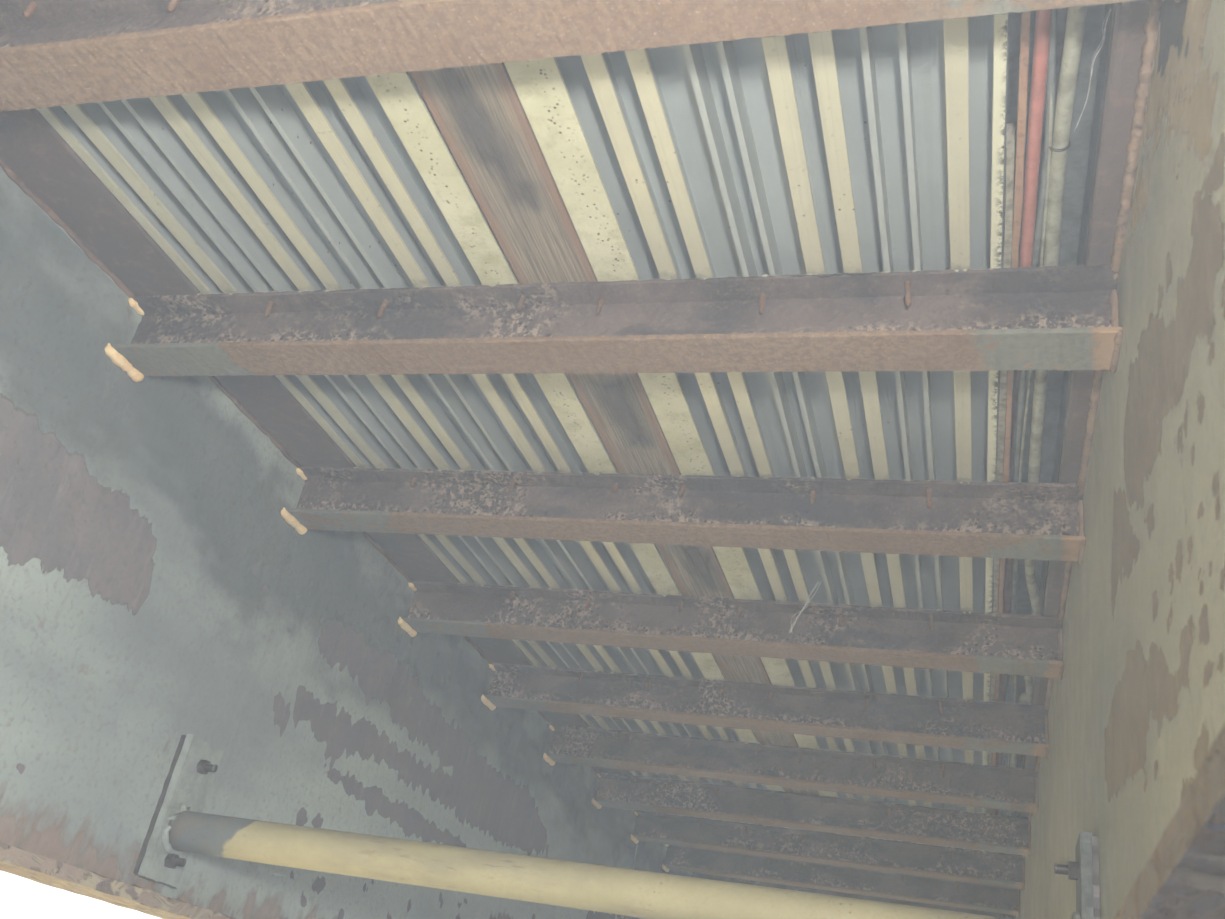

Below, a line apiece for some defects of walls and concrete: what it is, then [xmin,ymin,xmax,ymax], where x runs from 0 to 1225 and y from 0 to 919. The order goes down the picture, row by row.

peeling [1157,0,1189,78]
peeling [1111,133,1225,619]
peeling [1104,604,1209,802]